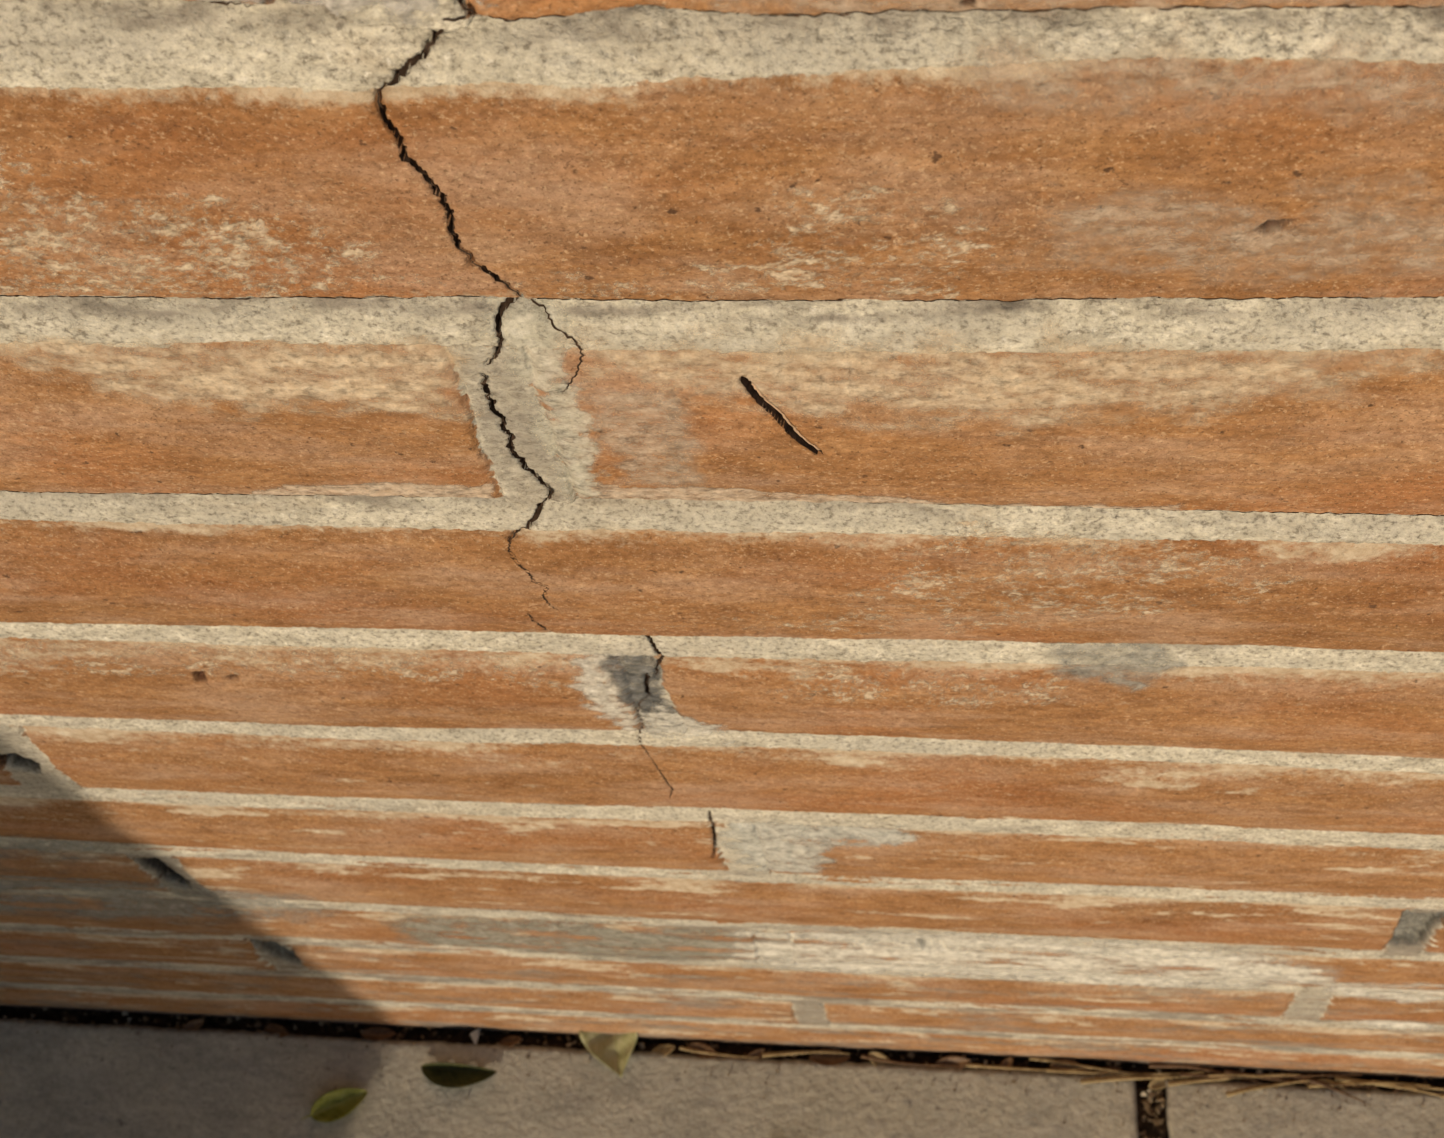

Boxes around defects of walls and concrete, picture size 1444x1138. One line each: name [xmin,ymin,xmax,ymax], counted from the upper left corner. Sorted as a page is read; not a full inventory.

crack [682,6,1124,18]
crack [1160,4,1444,12]
crack [903,296,1117,304]
crack [1157,294,1378,302]
crack [0,0,862,632]
crack [1068,506,1444,516]
crack [636,635,673,797]
crack [709,811,717,858]
peeling [144,857,185,881]
peeling [258,940,296,959]